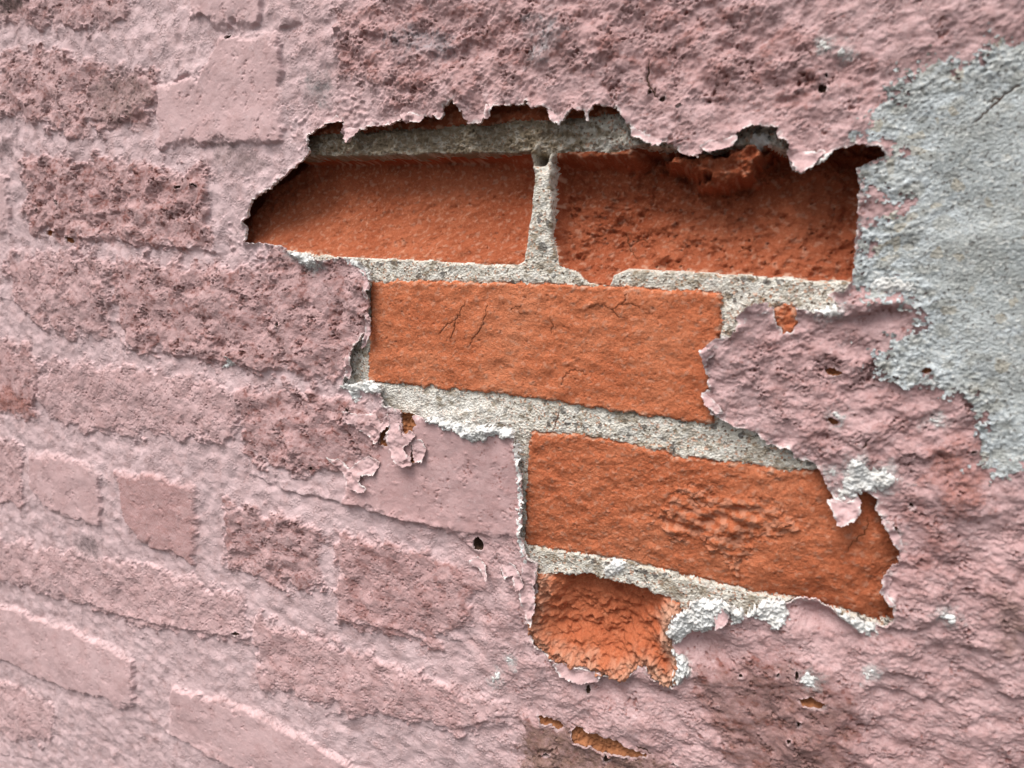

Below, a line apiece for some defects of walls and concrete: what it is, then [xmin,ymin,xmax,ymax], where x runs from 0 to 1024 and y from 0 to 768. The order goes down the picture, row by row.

crack [440,305,554,346]
peeling [245,101,903,688]
peeling [539,715,647,757]